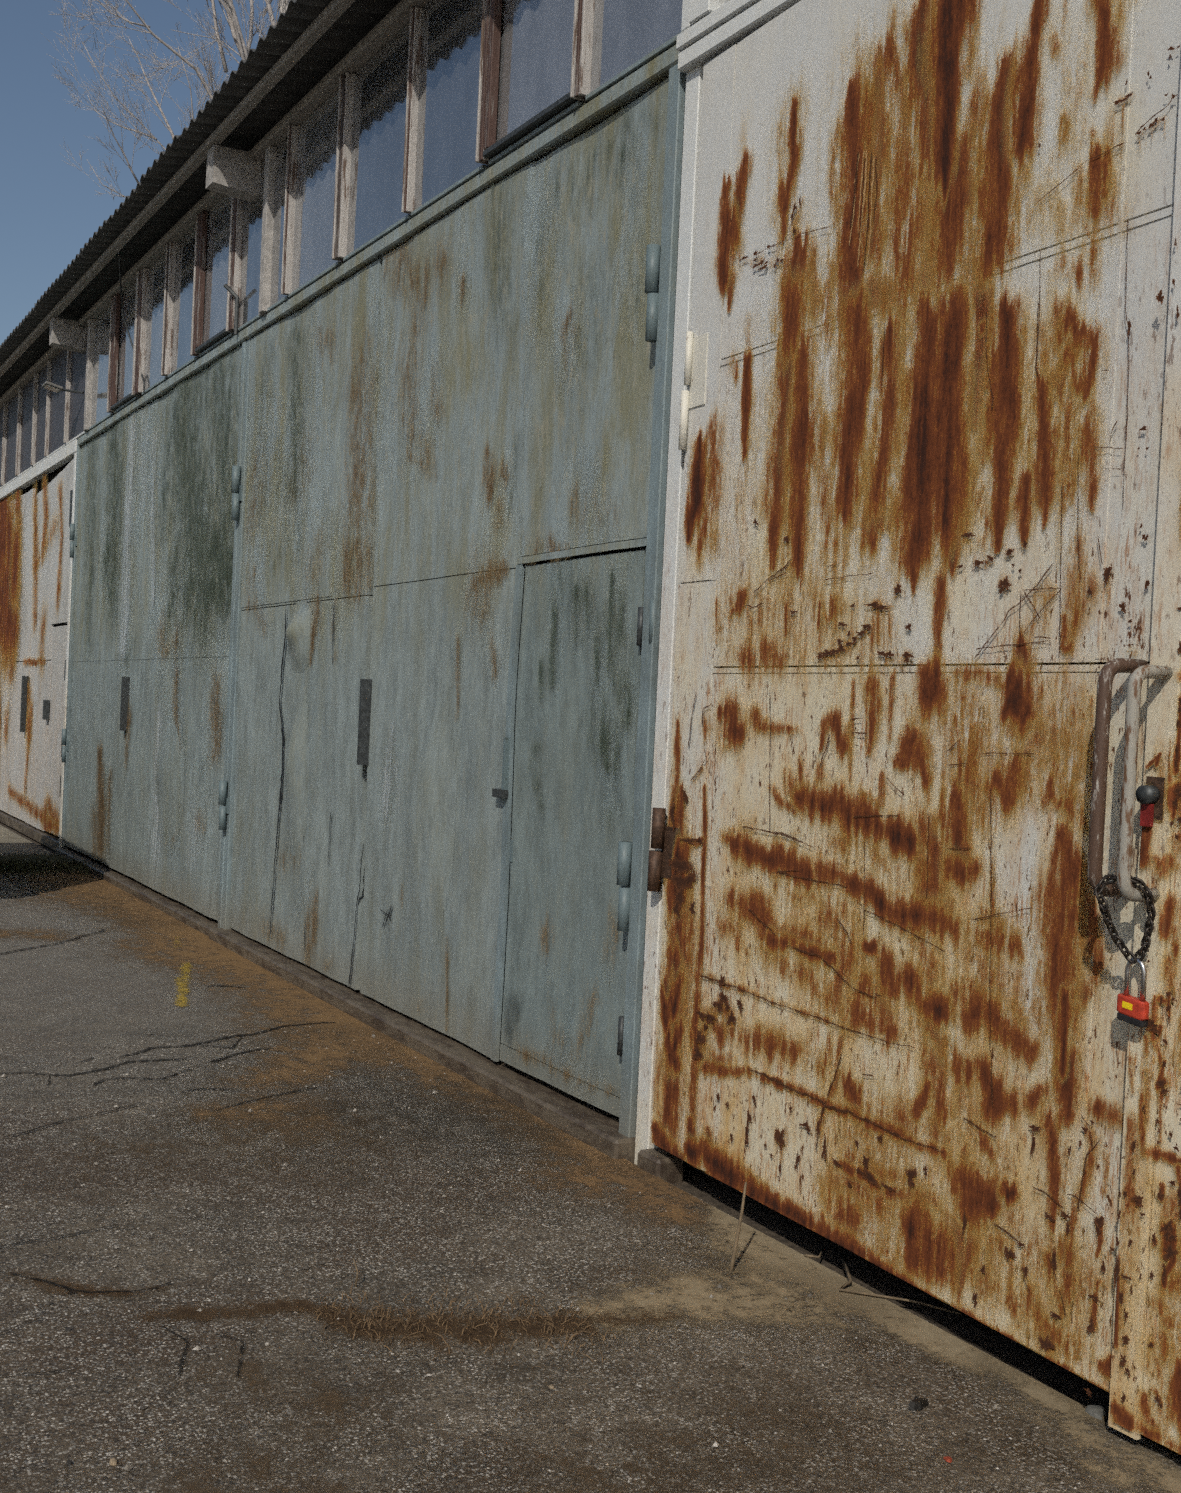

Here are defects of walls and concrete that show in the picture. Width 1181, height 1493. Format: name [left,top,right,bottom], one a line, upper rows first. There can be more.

corrosion [0,473,63,835]
water stain [102,419,155,665]
water stain [152,507,234,646]
corrosion [471,551,509,677]
corrosion [482,444,509,524]
water stain [538,582,588,696]
water stain [594,569,625,684]
crack [270,611,305,948]
water stain [600,683,631,773]
corrosion [650,0,1181,1455]